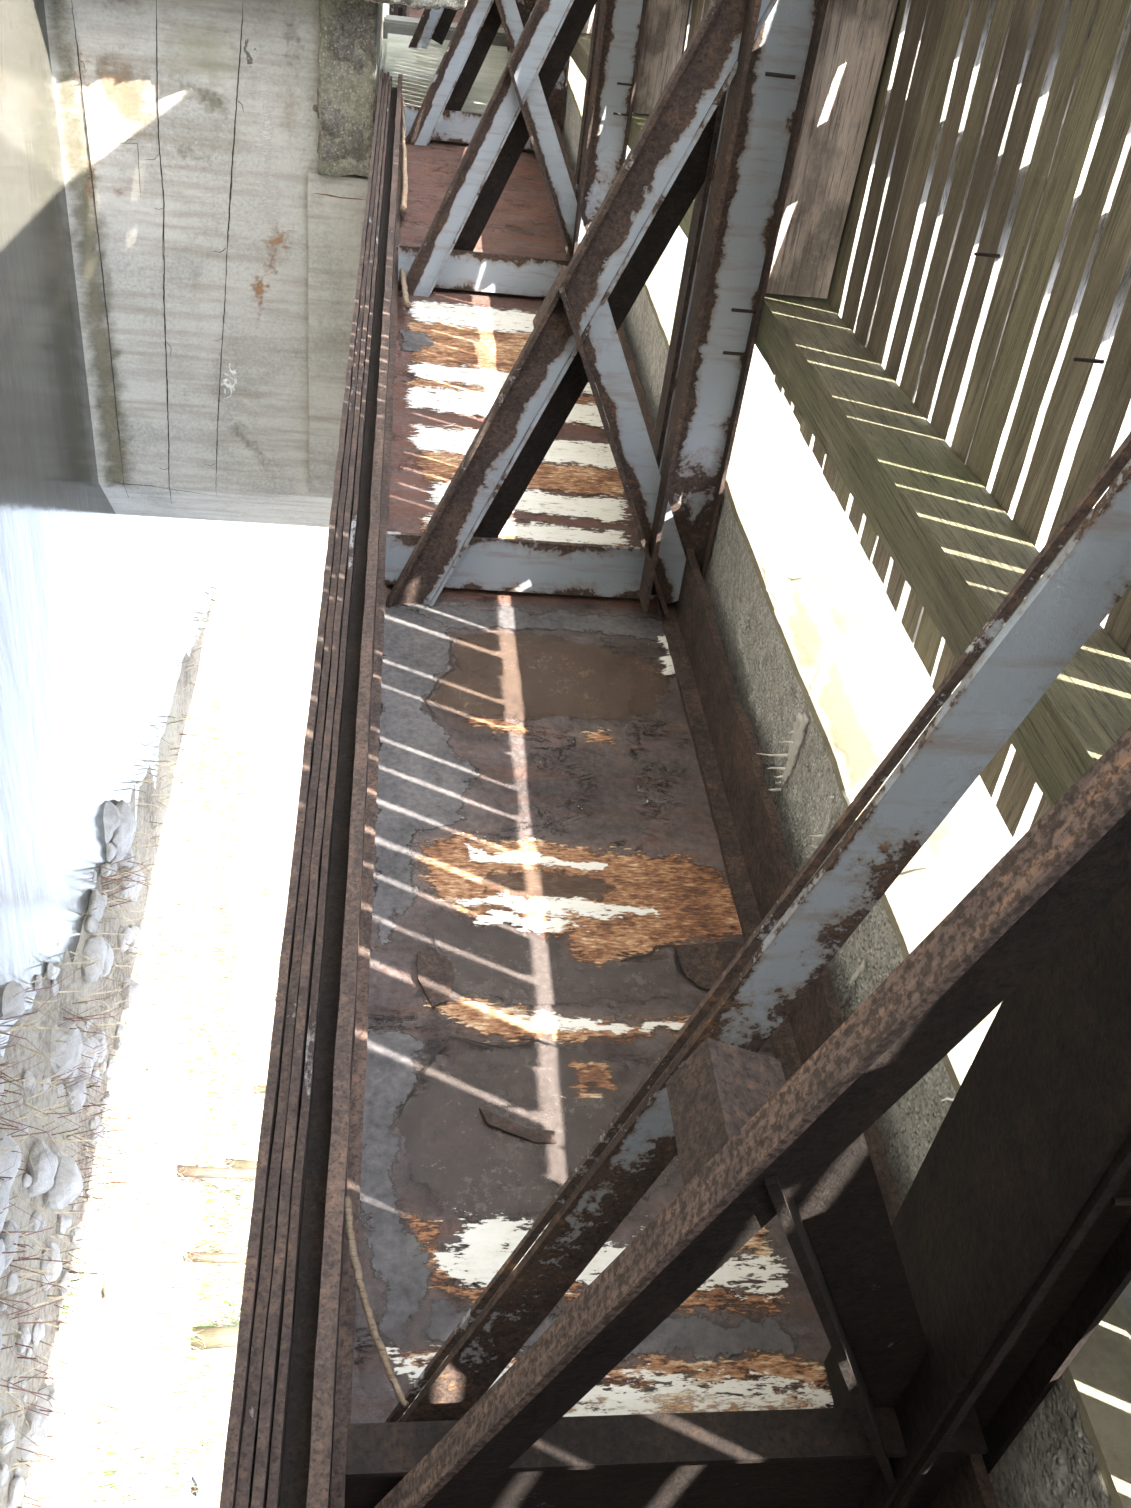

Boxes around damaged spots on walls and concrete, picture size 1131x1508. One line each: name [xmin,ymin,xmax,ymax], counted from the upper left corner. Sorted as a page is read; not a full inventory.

crack [71,0,244,503]
rust [252,264,272,304]
peeling [403,362,510,455]
peeling [542,382,617,470]
peeling [499,489,634,547]
peeling [456,892,660,935]
rust [352,603,749,1368]
peeling [427,1208,548,1289]
peeling [697,1253,791,1302]
rust [736,1225,773,1267]
peeling [563,1358,833,1417]
rust [567,1281,831,1415]